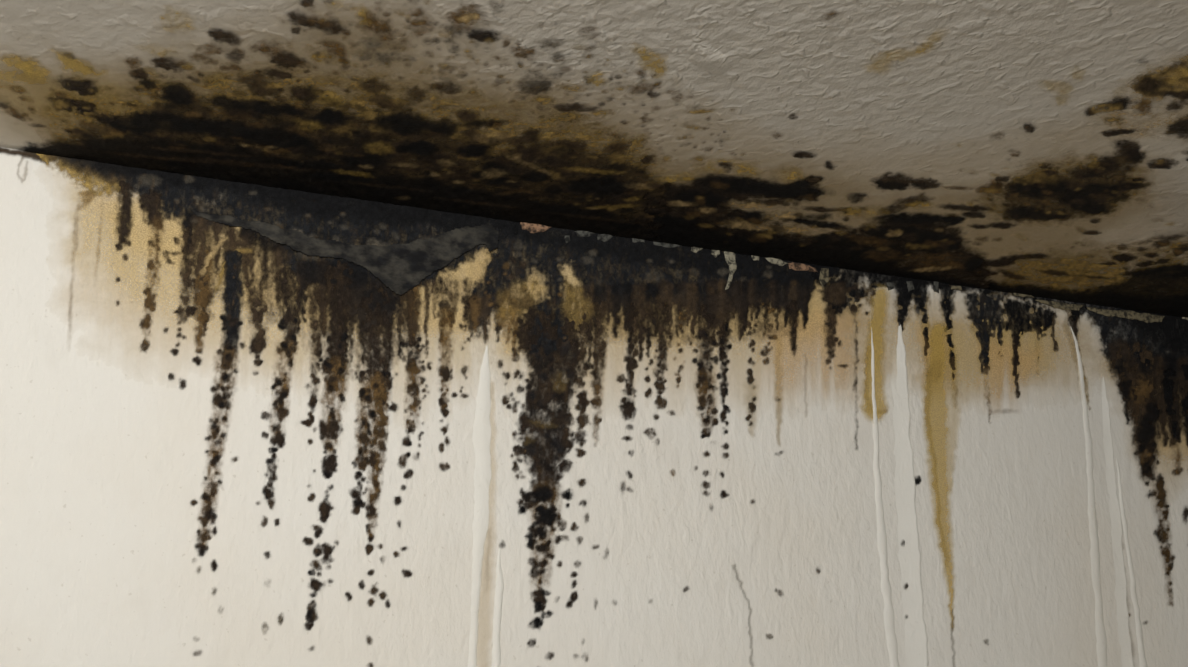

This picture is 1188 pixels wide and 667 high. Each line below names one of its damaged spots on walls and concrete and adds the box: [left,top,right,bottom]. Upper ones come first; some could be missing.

damp [288,12,350,35]
damp [400,5,534,68]
damp [1086,56,1188,139]
damp [873,173,940,190]
damp [301,389,317,426]
damp [262,372,290,509]
damp [403,419,424,446]
damp [399,452,419,478]
damp [696,467,728,498]
damp [303,485,338,630]
damp [345,570,390,607]
damp [566,563,580,607]